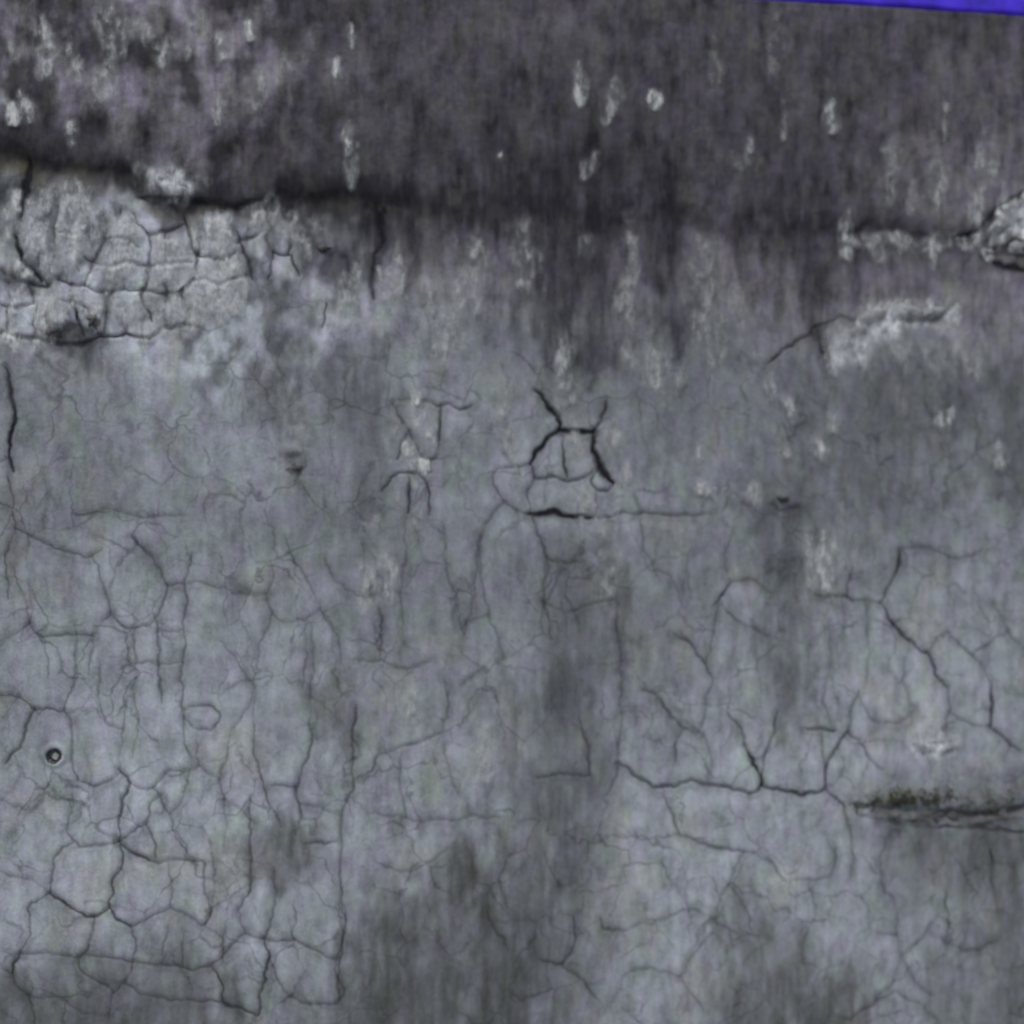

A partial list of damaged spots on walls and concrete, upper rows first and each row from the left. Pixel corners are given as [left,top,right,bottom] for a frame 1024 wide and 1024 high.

damp [3,91,32,126]
damp [574,63,585,106]
damp [647,90,663,110]
damp [4,190,21,239]
spalling [975,193,1024,256]
damp [14,258,32,278]
crack [0,160,300,346]
crack [7,370,17,472]
crack [529,390,615,492]
crack [528,508,592,519]
crack [744,745,828,796]
spalling [876,807,1016,825]